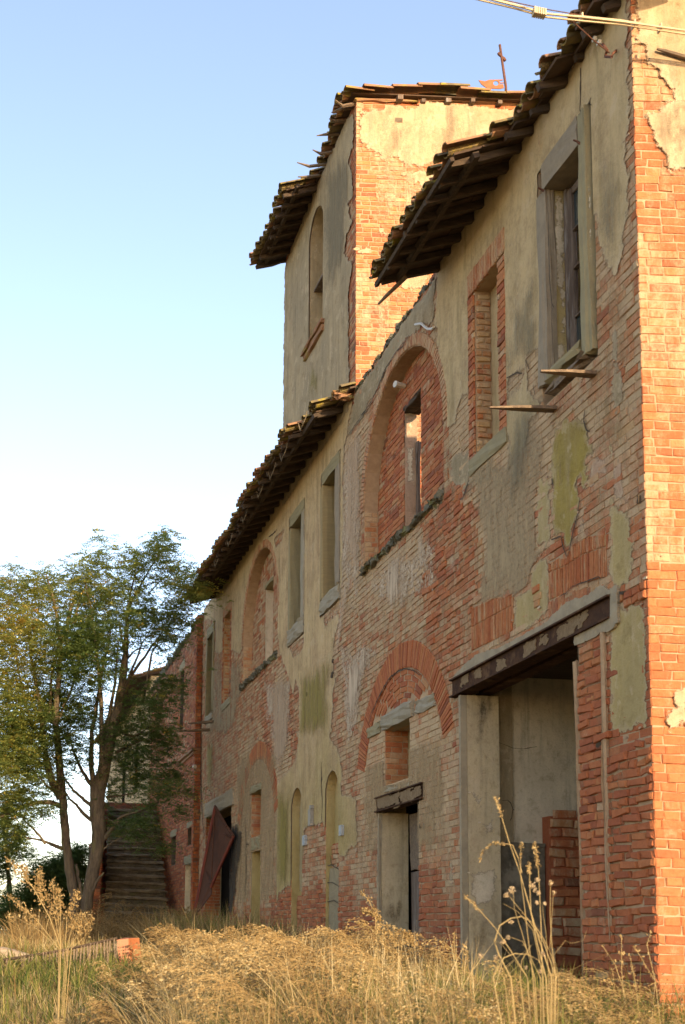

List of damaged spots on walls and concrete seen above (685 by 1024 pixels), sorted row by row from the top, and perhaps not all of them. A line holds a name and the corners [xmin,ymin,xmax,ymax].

spalling [302,823,326,936]
spalling [338,133,662,1016]